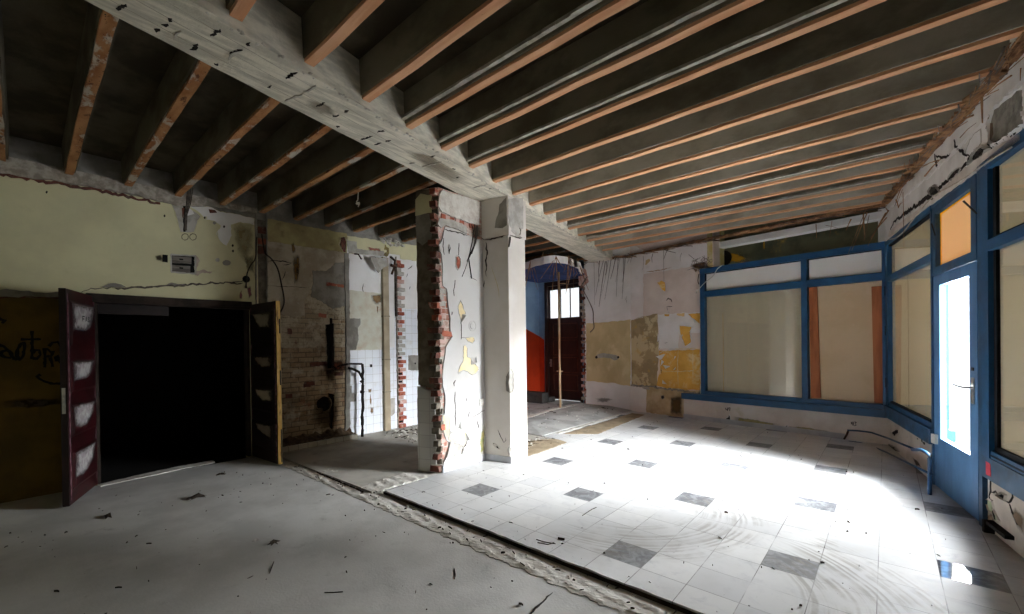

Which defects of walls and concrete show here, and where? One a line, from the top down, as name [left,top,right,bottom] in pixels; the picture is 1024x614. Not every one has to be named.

spalling [919,83,1024,206]
peeling [171,204,255,246]
crack [81,281,242,293]
peeling [326,282,383,350]
peeling [458,300,466,324]
spalling [391,257,418,428]
peeling [458,337,479,375]
peeling [656,313,700,399]
peeling [442,414,470,458]